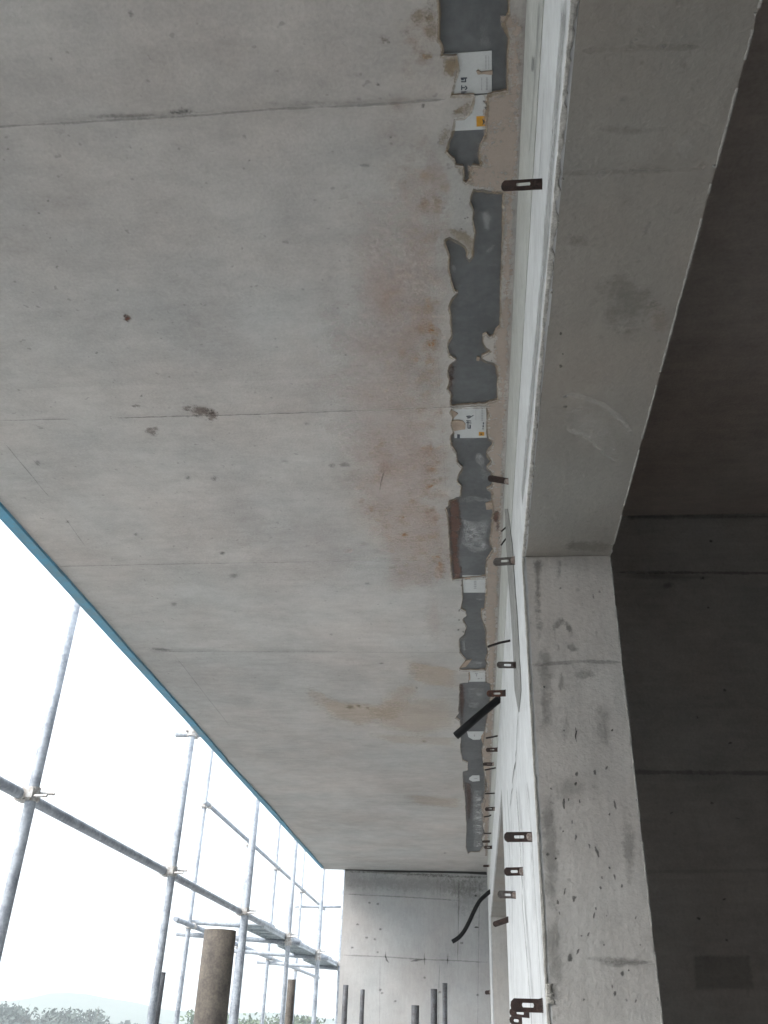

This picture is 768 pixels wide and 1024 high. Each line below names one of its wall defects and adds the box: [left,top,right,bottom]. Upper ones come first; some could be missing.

peeling [438,0,509,95]
peeling [445,129,507,853]